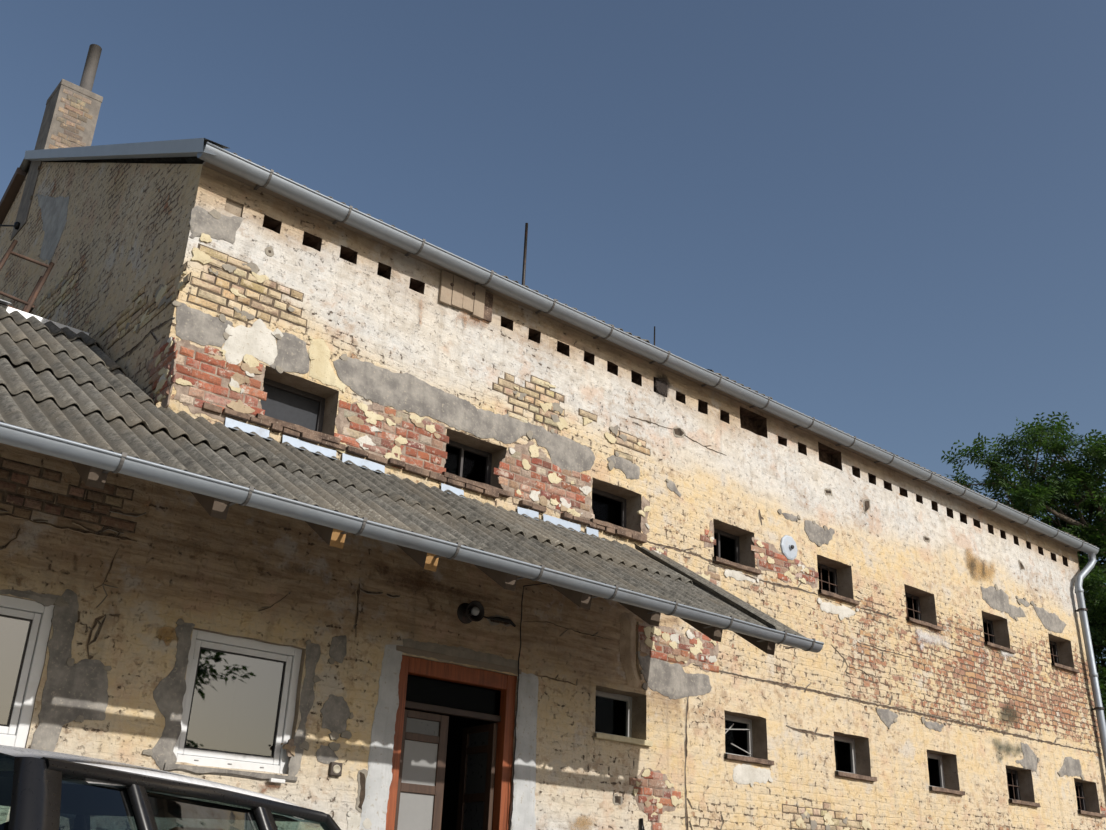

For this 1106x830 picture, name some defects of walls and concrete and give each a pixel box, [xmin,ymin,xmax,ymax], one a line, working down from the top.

spalling [100,233,316,427]
spalling [334,400,449,475]
spalling [492,372,597,526]
spalling [604,425,650,470]
crack [0,505,146,660]
spalling [636,621,719,673]
spalling [750,537,822,604]
crack [860,607,898,619]
crack [693,642,1102,754]
spalling [613,768,683,830]
crack [684,696,693,830]
spalling [782,802,872,830]